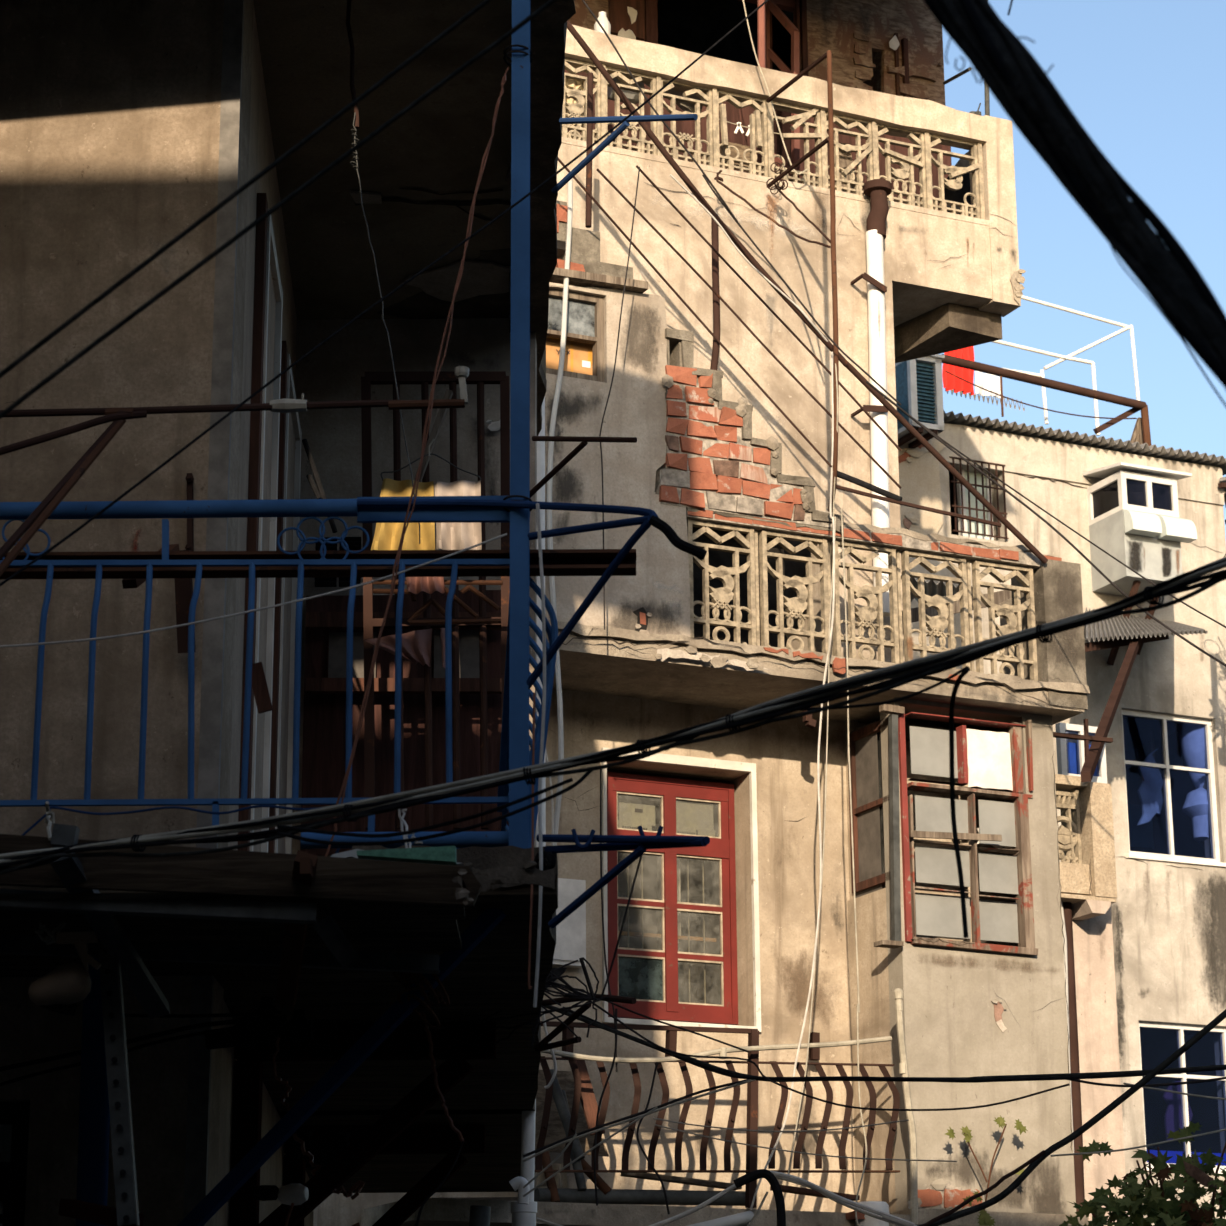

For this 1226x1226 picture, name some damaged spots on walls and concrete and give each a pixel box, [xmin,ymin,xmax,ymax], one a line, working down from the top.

peeling [400,260,511,302]
water stain [627,306,655,370]
flaking render [657,365,920,546]
spalling [931,542,1019,561]
flaking render [633,607,652,636]
flaking render [655,645,847,675]
water stain [1197,876,1226,1008]